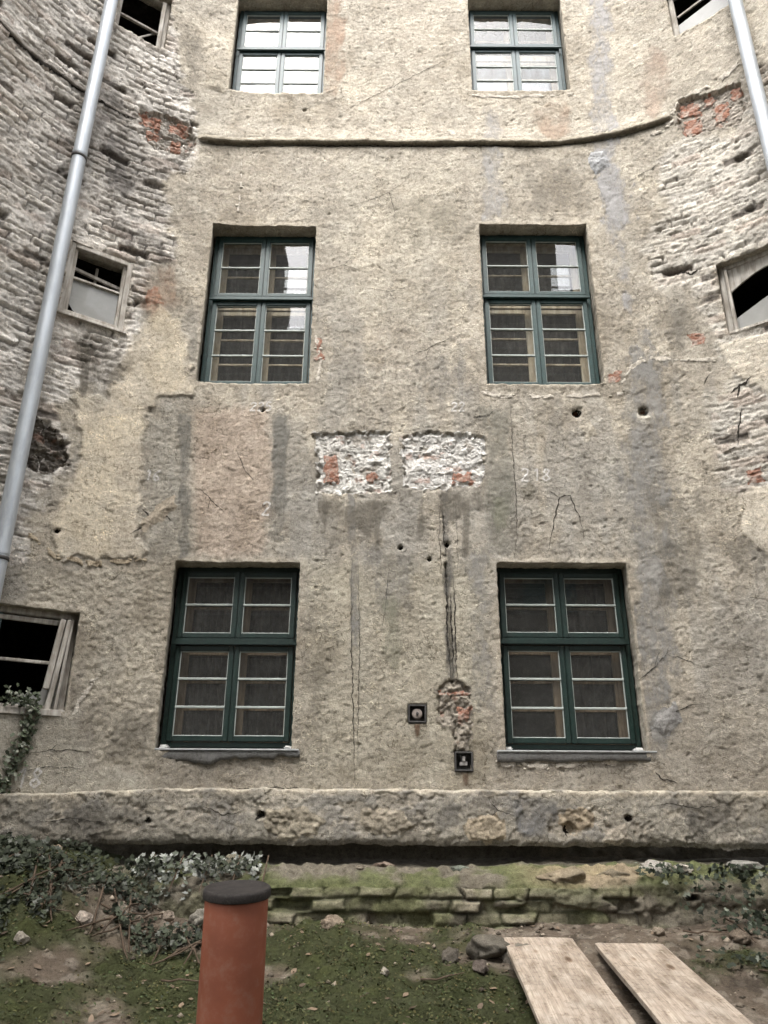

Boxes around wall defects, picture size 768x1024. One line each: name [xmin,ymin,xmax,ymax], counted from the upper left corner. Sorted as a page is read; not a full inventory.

peeling [650,61,744,137]
flaking render [138,111,189,154]
spalling [27,415,72,475]
spalling [312,430,486,496]
crack [548,491,585,550]
spalling [434,677,474,754]